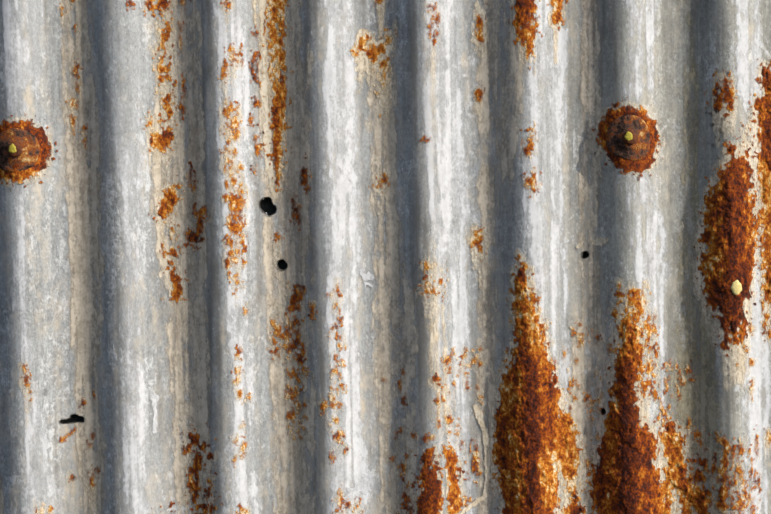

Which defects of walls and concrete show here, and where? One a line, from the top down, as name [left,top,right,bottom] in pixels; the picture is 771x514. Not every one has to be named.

rust [0,114,58,191]
rust [126,0,196,315]
rust [217,0,312,315]
rust [349,0,397,122]
rust [471,0,488,57]
rust [508,0,569,75]
rust [592,97,665,181]
rust [693,60,771,402]
rust [160,423,224,514]
rust [270,232,318,443]
rust [320,281,349,464]
rust [389,250,771,514]